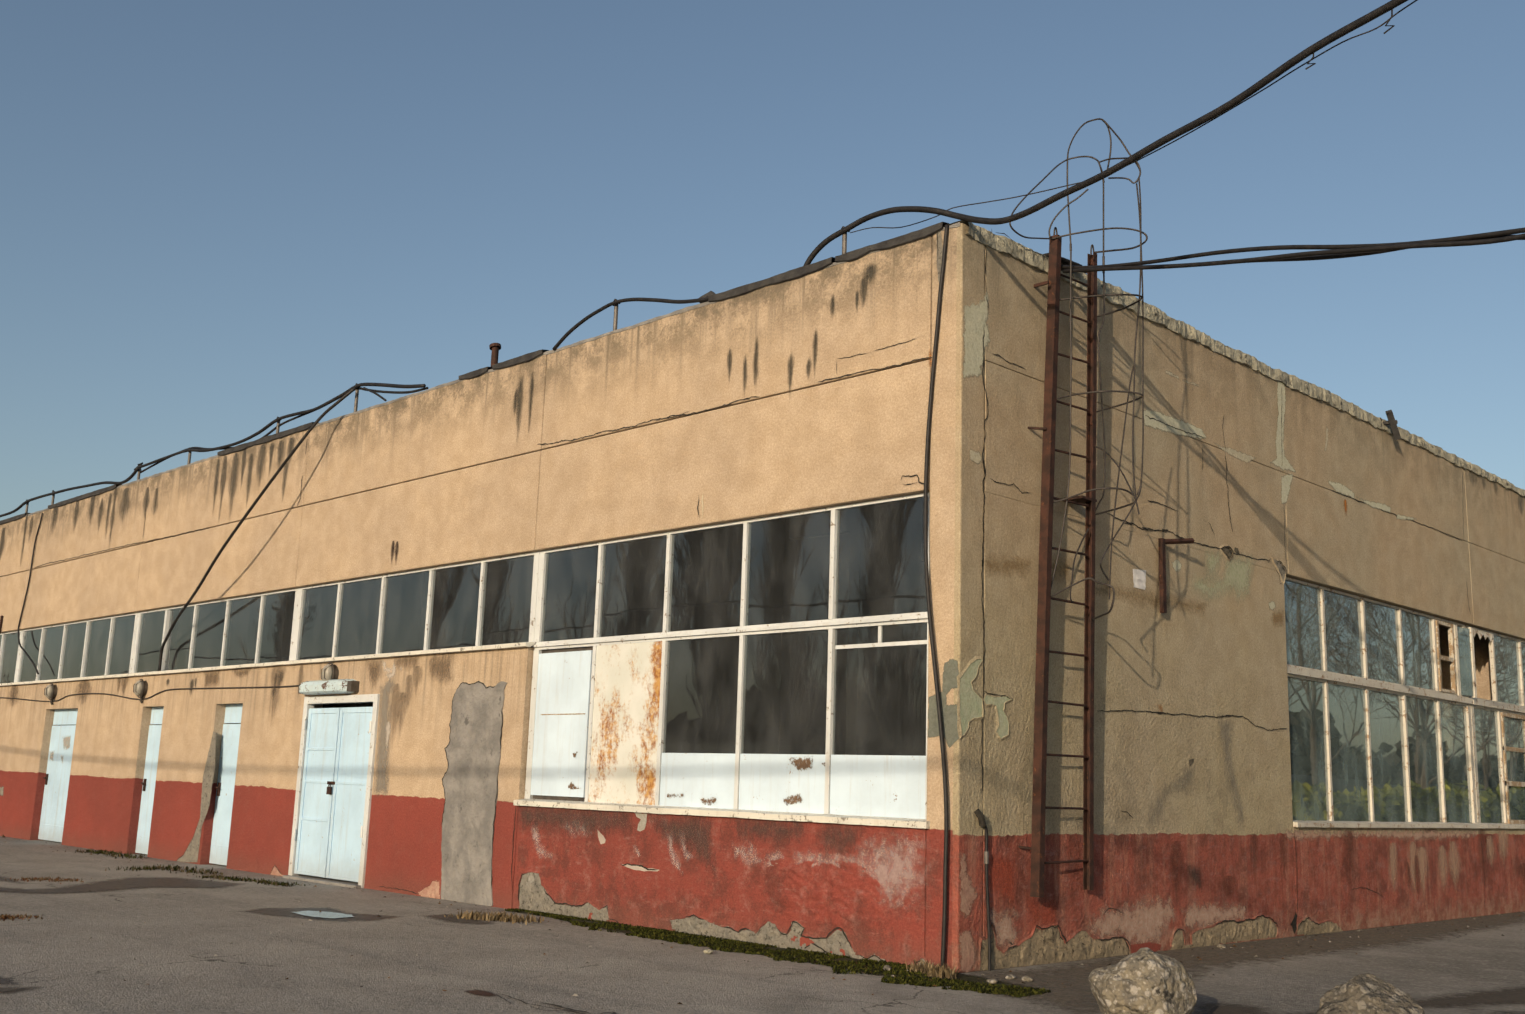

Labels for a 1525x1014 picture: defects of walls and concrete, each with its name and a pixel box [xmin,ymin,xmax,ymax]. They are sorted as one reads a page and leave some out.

leakage [856,265,875,307]
leakage [727,342,758,389]
leakage [788,331,817,389]
peeling [963,291,990,378]
leakage [214,438,294,507]
leakage [51,487,158,536]
peeling [957,656,1013,741]
crack [1100,710,1288,731]
spalling [621,863,659,871]
spalling [518,869,618,922]
spalling [669,913,887,962]
spalling [959,855,1278,972]